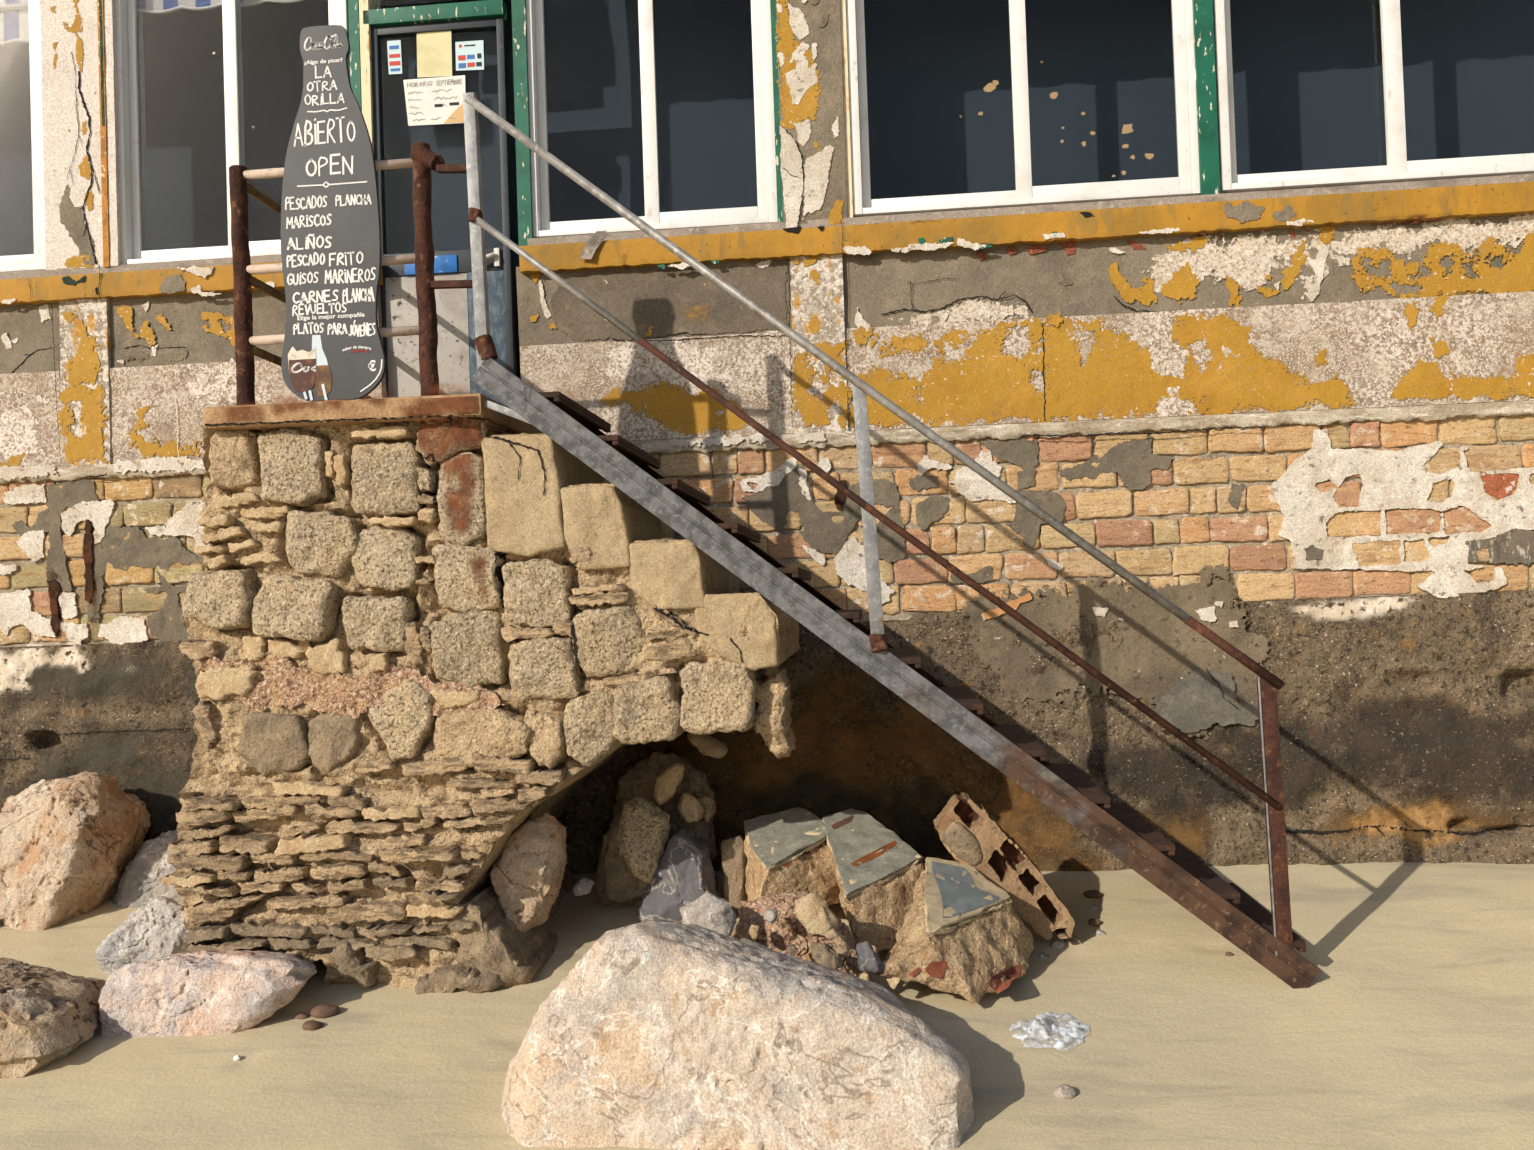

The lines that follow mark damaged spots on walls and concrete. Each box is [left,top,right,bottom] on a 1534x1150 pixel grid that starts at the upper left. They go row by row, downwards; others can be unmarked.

crack [66,52,103,300]
peeling [775,0,844,228]
peeling [0,298,206,505]
crack [841,222,1266,438]
peeling [740,200,1534,503]
rust [46,571,62,636]
flaking render [0,500,149,693]
leakage [8,661,162,701]
rust [83,519,95,604]
leakage [180,660,199,696]
flaking render [1271,429,1534,620]
leakage [1,728,198,841]